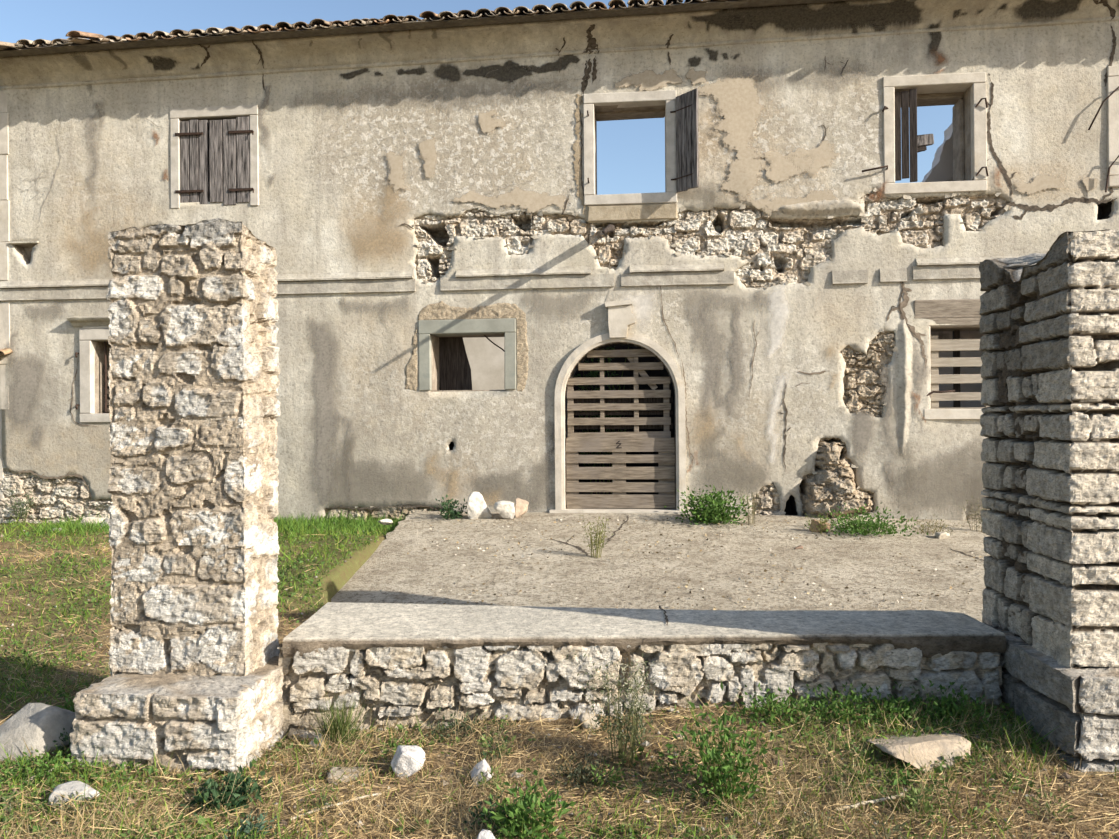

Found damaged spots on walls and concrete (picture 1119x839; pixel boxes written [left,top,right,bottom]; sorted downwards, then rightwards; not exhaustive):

water stain [688,0,942,53]
water stain [998,0,1082,20]
water stain [340,68,382,79]
water stain [376,54,580,103]
peeling [386,138,437,193]
flaking render [413,68,1065,290]
crack [969,73,1117,220]
crack [660,272,694,464]
flaking render [840,329,898,418]
crack [887,282,927,368]
crack [778,371,826,469]
flaking render [0,460,113,523]